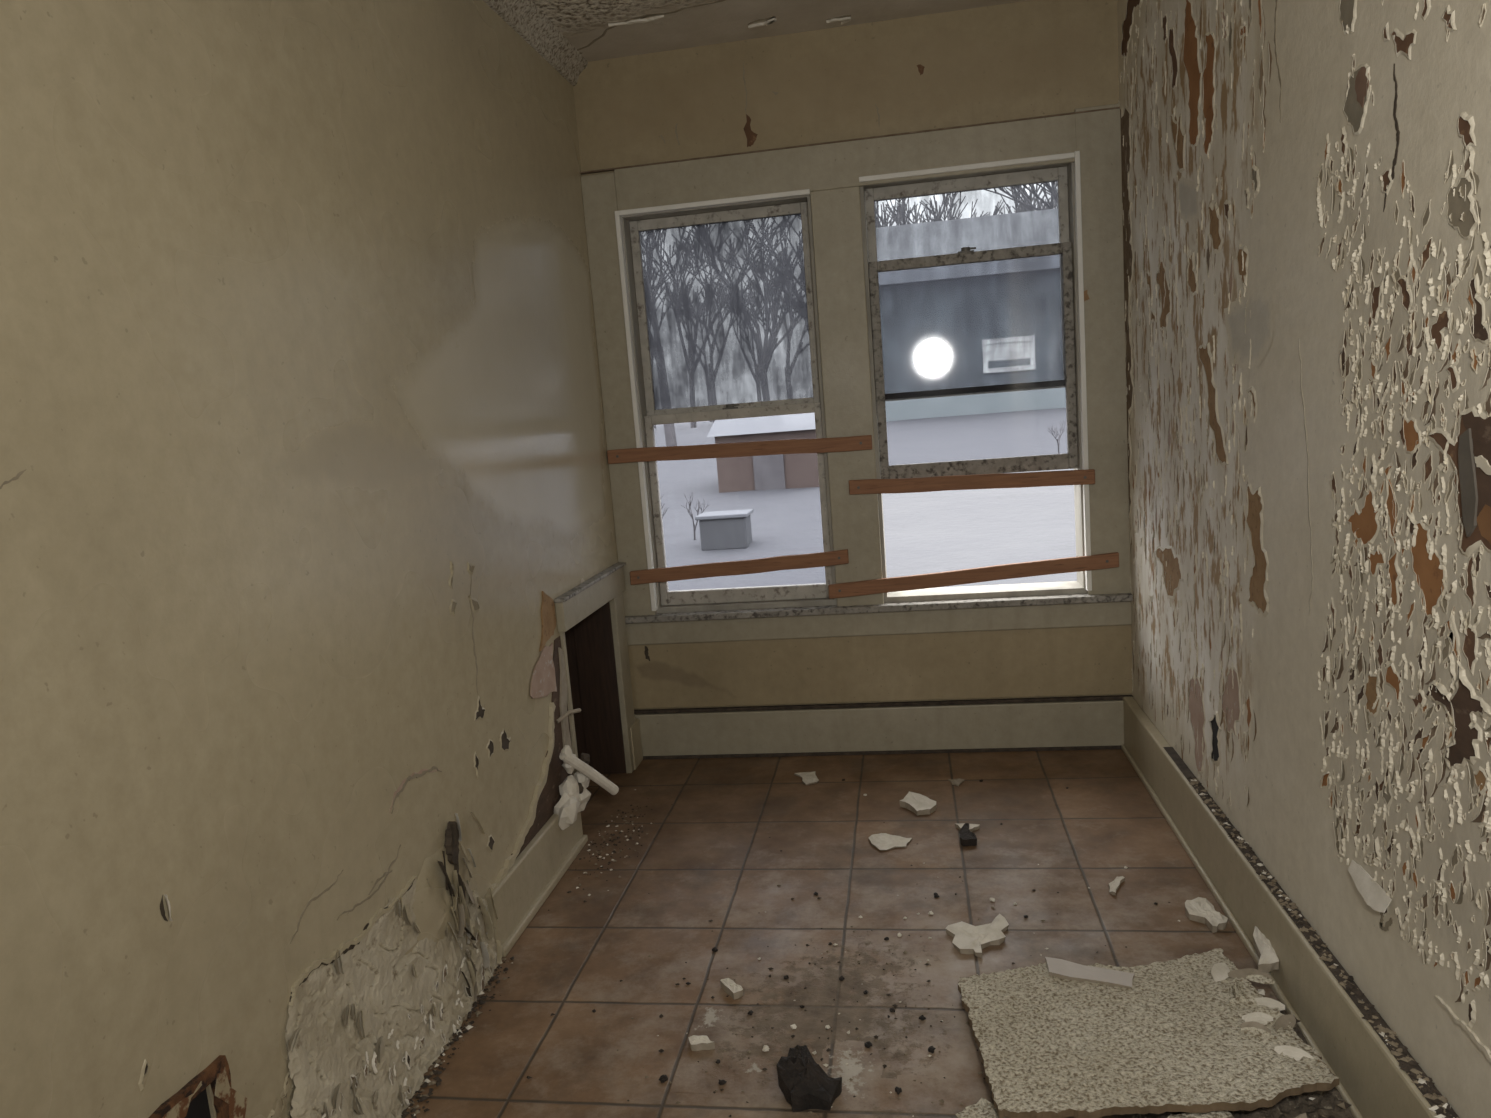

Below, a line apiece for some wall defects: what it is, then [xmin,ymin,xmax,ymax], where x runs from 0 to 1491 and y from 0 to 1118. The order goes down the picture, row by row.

spalling [1339,0,1357,36]
spalling [1382,0,1457,60]
crack [1379,64,1400,212]
peeling [1118,0,1273,818]
peeling [1315,53,1491,1063]
spalling [474,695,486,721]
spalling [473,728,511,778]
spalling [285,812,503,1118]
spalling [1211,963,1314,1061]